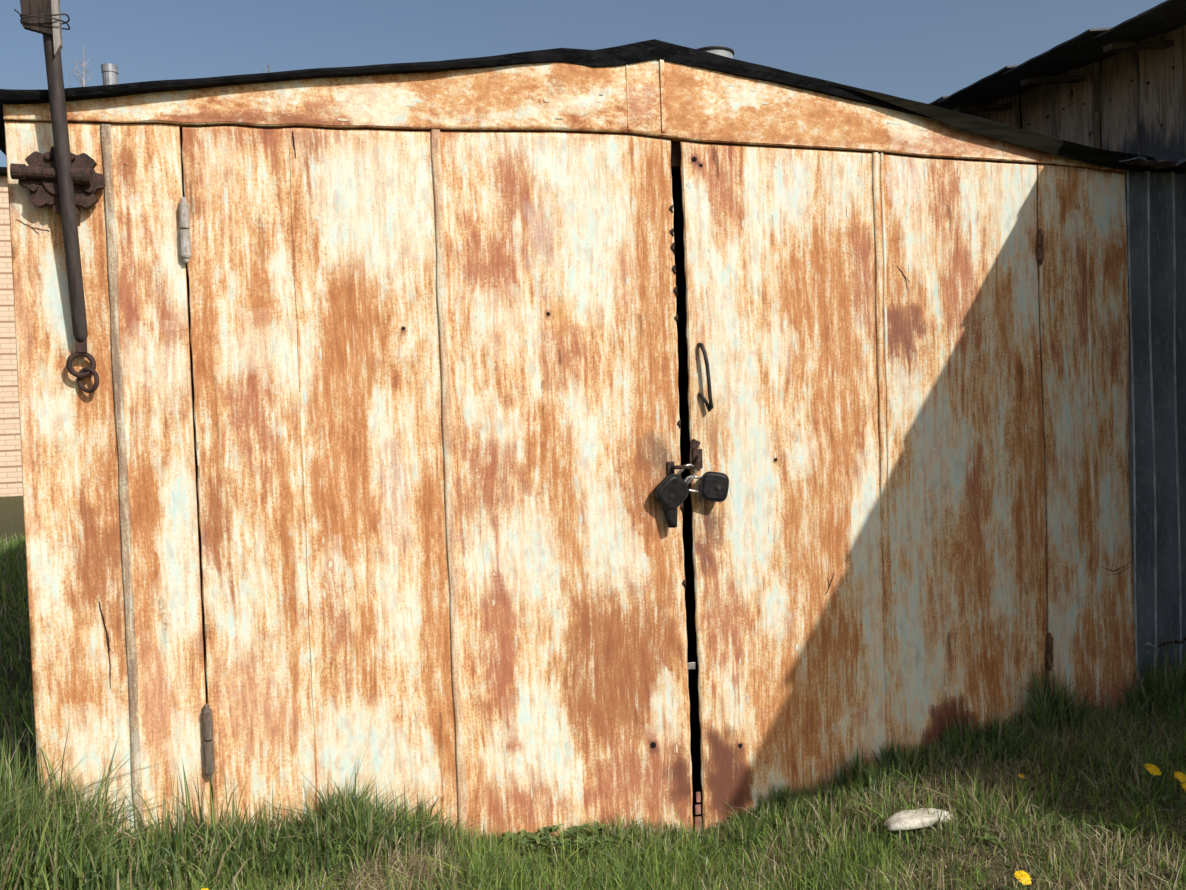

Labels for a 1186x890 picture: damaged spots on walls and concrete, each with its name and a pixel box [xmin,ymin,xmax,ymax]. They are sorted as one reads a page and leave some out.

corrosion [13,204,52,541]
corrosion [29,567,38,622]
corrosion [32,189,129,802]
crack [99,601,111,689]
corrosion [112,60,1136,842]